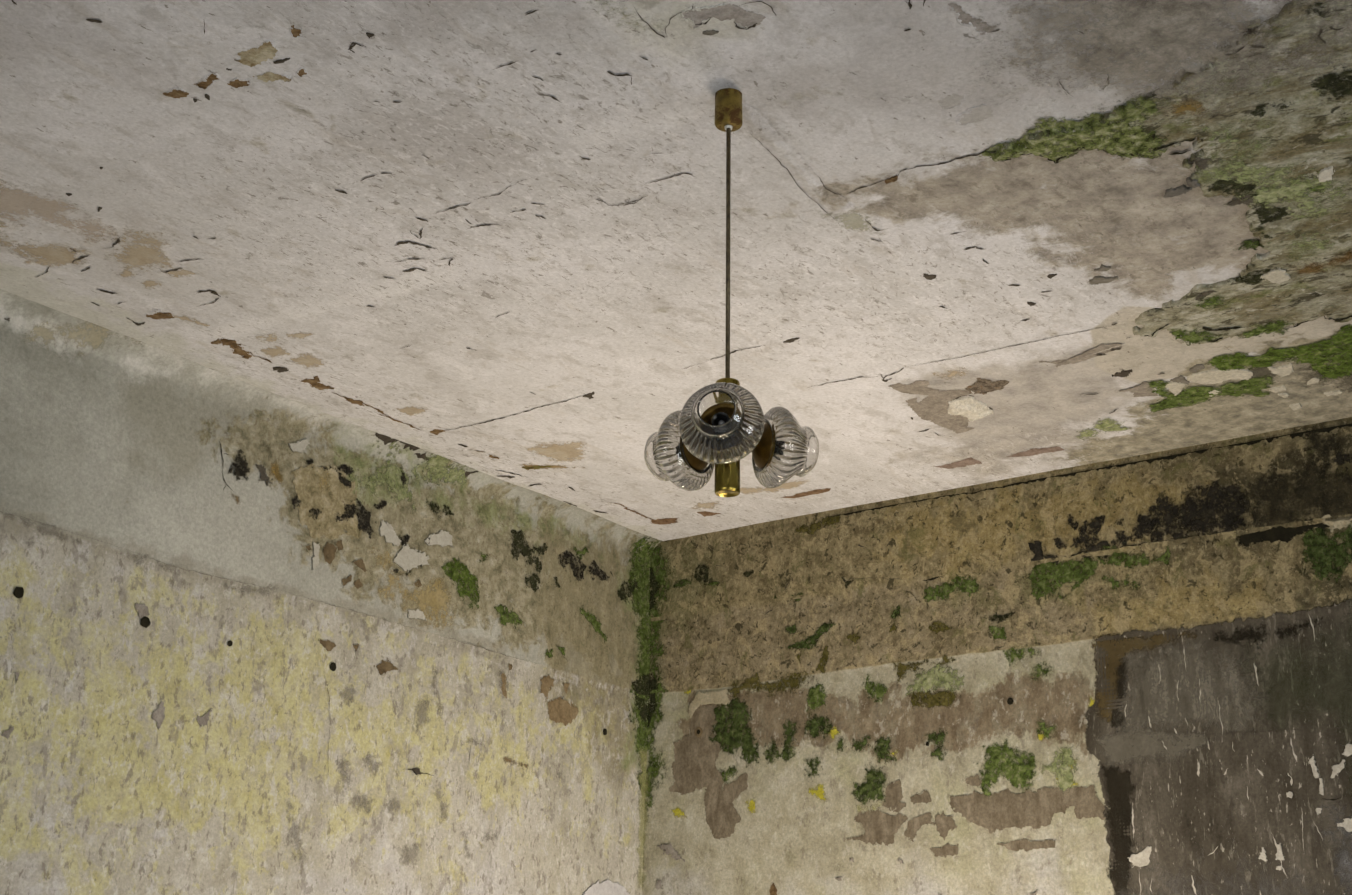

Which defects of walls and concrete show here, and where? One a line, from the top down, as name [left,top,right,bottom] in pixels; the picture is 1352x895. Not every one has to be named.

flaking render [678,4,766,36]
spalling [163,40,308,103]
crack [751,134,989,224]
damp [988,0,1352,344]
flaking render [288,439,453,589]
peeling [375,432,432,460]
peeling [458,444,553,487]
flaking render [889,378,1009,436]
damp [1028,429,1352,565]
peeling [1112,356,1302,410]
peeling [669,689,748,840]
damp [1085,599,1352,895]